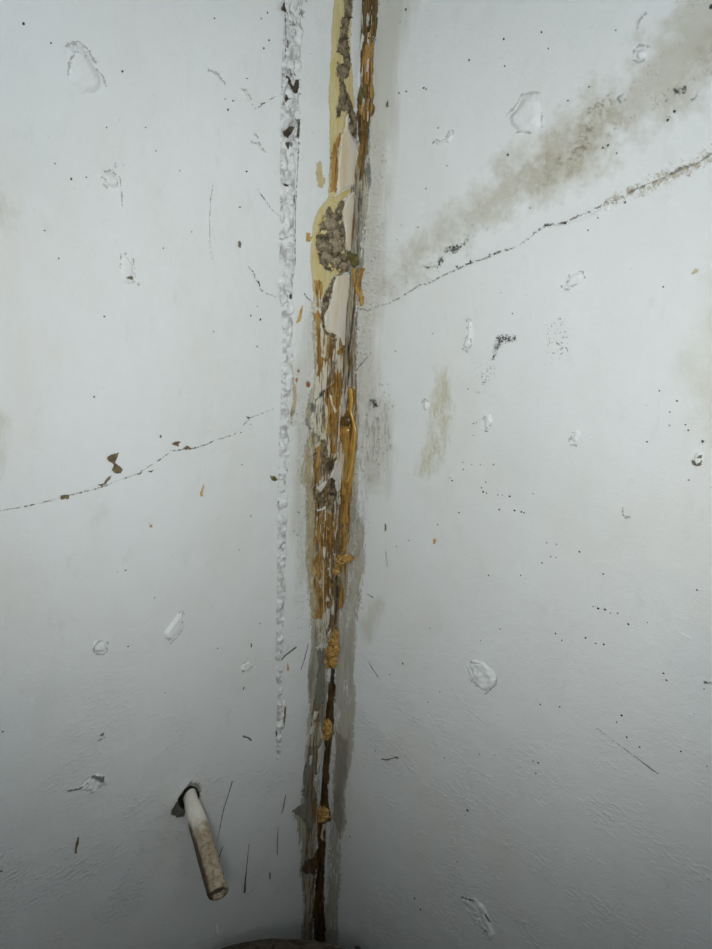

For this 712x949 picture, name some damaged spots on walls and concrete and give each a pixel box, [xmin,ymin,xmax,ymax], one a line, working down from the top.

peeling [282,0,359,307]
crack [0,411,264,509]
spalling [315,439,341,515]
crack [332,576,340,626]
corrosion [301,0,379,943]
crack [295,153,712,466]